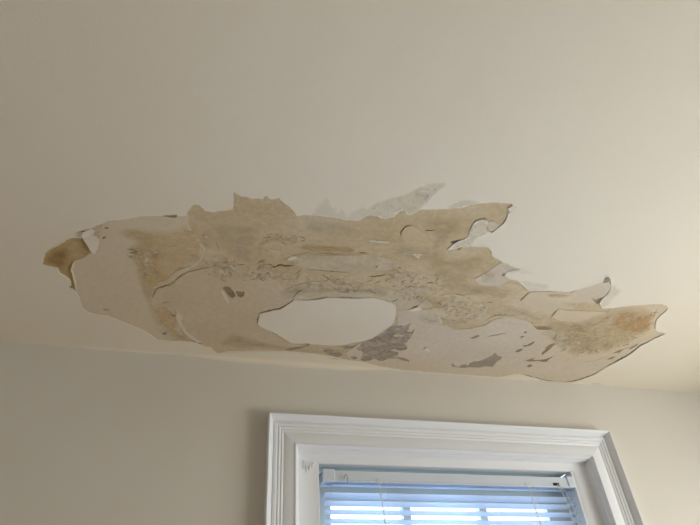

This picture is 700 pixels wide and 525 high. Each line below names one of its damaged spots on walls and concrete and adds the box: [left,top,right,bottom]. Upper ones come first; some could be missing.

peeling [43,193,667,382]